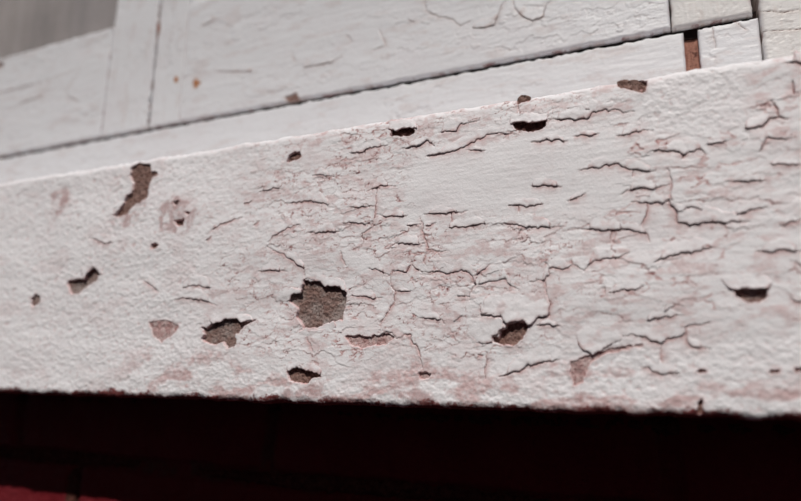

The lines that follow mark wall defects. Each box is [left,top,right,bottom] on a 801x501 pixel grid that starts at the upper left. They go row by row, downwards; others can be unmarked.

crack [402,116,515,157]
peeling [509,95,548,132]
crack [539,98,653,142]
crack [733,101,799,182]
peeling [116,163,158,216]
crack [528,136,767,327]
peeling [204,312,256,348]
peeling [275,271,347,338]
crack [206,167,586,367]
peeling [467,290,550,346]
peeling [720,273,772,303]
crack [478,349,556,378]